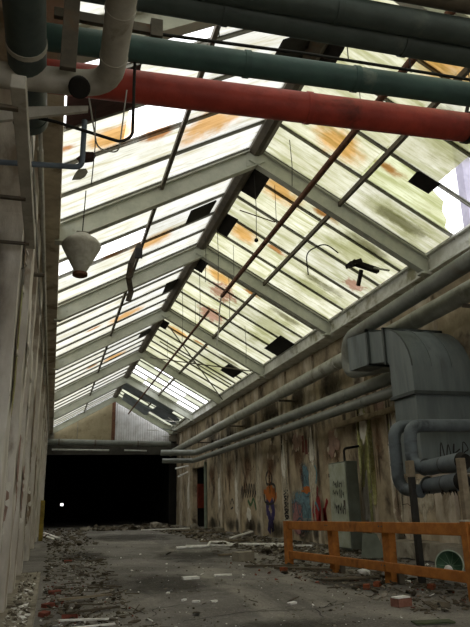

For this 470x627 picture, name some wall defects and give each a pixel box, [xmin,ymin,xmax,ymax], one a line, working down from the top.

leakage [322,371,339,398]
leakage [292,389,303,410]
leakage [242,403,282,429]
leakage [303,424,320,521]
leakage [228,519,261,533]